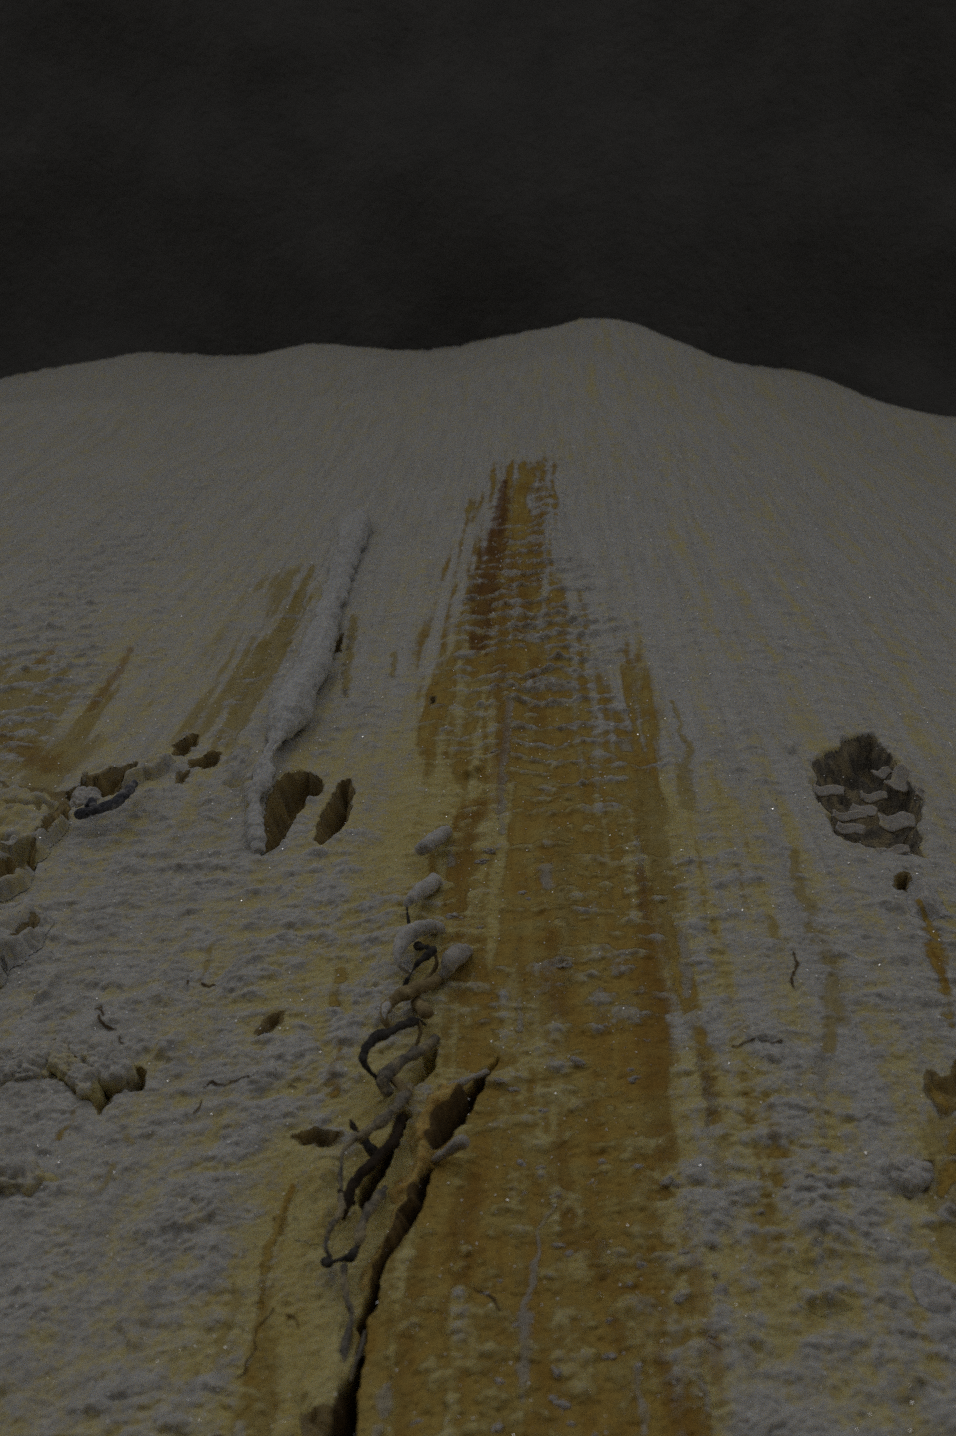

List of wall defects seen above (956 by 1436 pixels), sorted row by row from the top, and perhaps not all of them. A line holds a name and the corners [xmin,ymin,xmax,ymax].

spalling [0,761,138,987]
spalling [171,733,222,783]
spalling [261,770,355,856]
corrosion [357,458,710,1436]
spalling [812,733,925,892]
spalling [38,1034,146,1115]
corrosion [694,1027,720,1124]
corrosion [231,1183,295,1436]
crack [333,1074,490,1436]